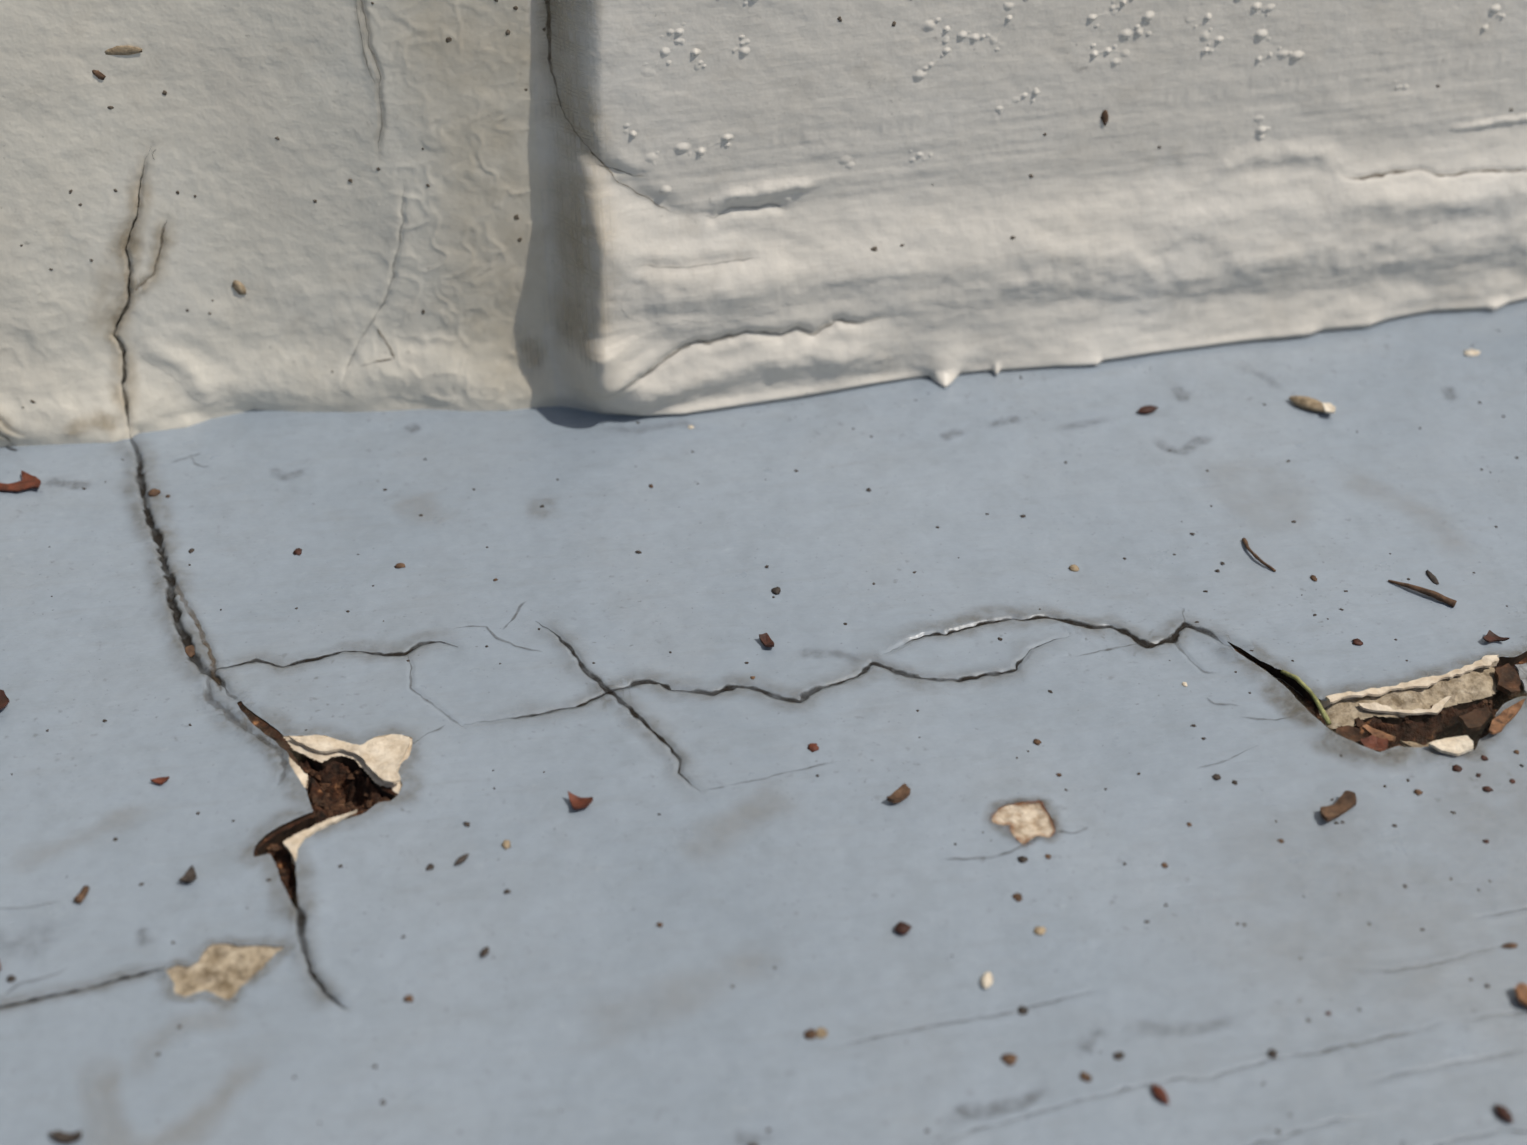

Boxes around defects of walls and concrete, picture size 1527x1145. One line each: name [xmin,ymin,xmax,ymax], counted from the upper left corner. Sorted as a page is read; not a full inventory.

crack [1356,170,1504,180]
crack [634,331,781,382]
crack [113,155,450,685]
crack [514,616,1214,783]
spalling [1227,641,1527,750]
spalling [237,701,413,908]
spalling [992,800,1055,845]
spalling [165,942,284,1000]
crack [295,906,340,1006]